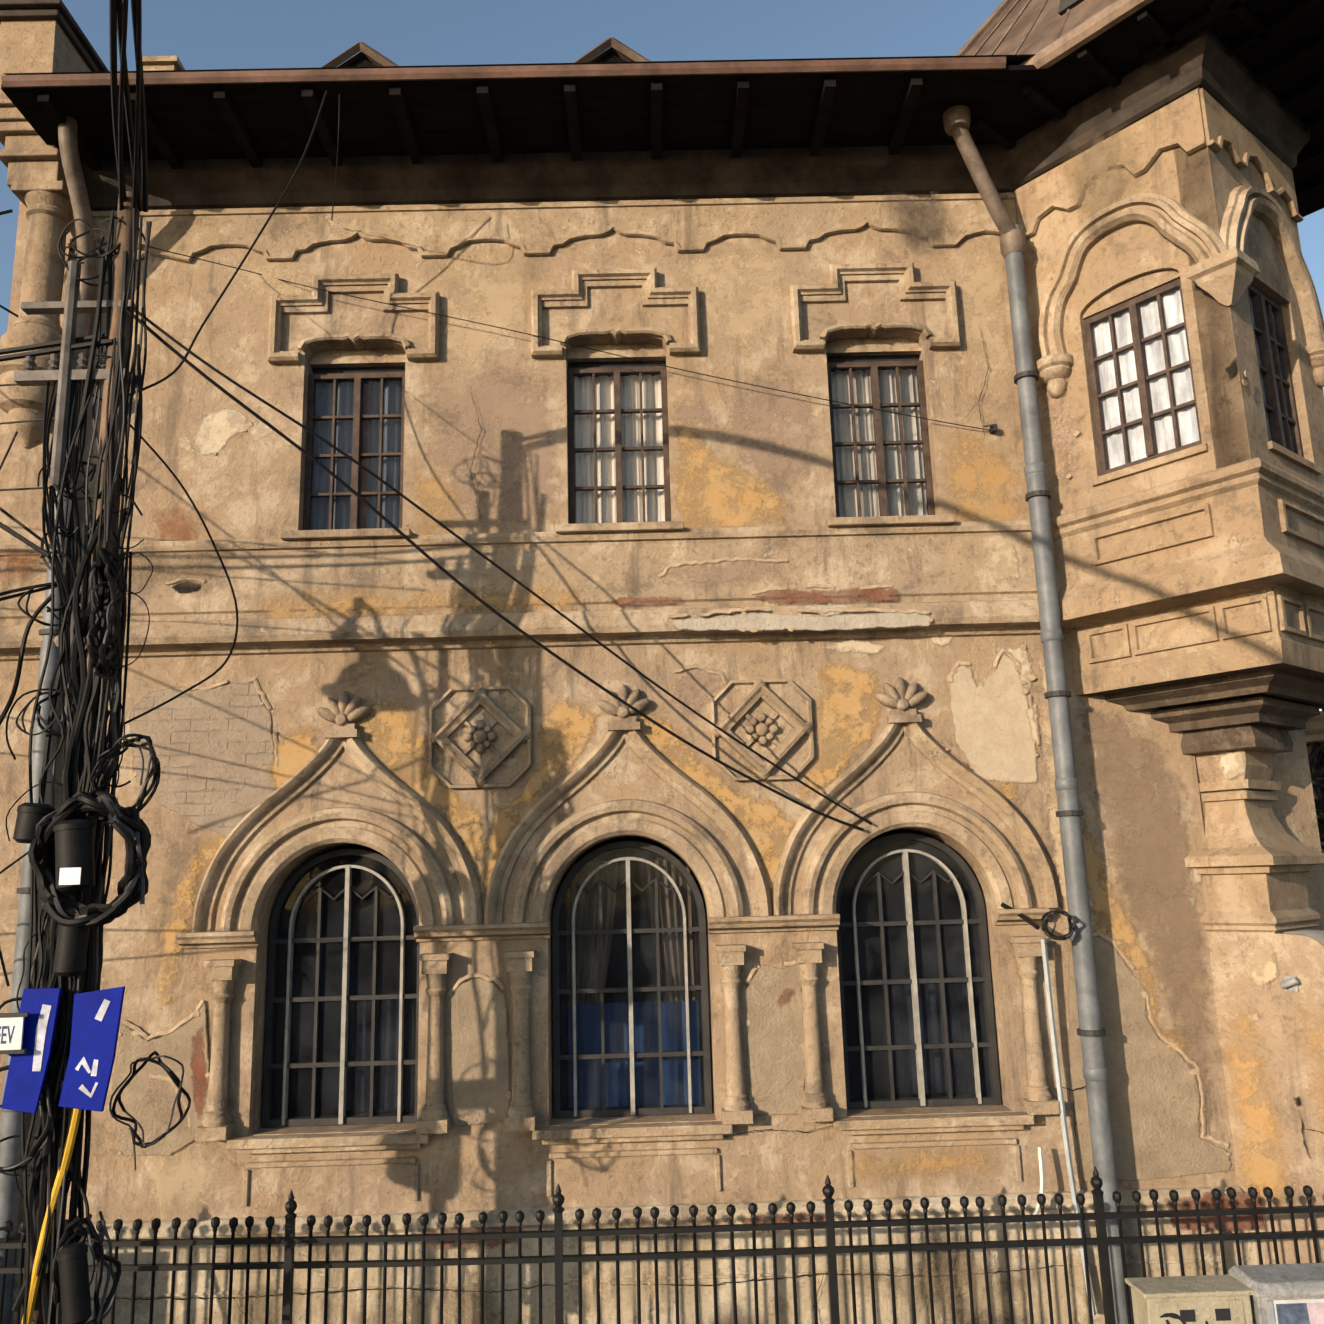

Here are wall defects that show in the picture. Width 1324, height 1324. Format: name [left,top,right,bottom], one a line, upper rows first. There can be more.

flaking render [112,1000,210,1156]
flaking render [129,677,321,1006]
peeling [358,699,596,893]
peeling [637,713,795,901]
flaking render [745,960,805,1115]
flaking render [610,584,952,799]
peeling [943,645,1094,1182]
flaking render [1081,813,1233,1181]
peeling [1220,751,1244,778]
damp [392,1275,494,1324]
damp [583,1275,611,1299]
damp [914,1229,979,1299]